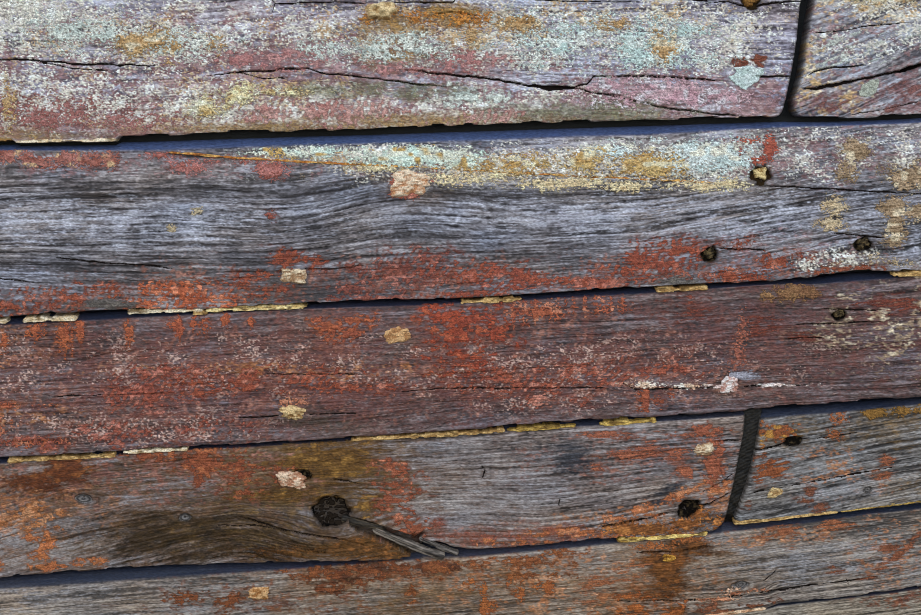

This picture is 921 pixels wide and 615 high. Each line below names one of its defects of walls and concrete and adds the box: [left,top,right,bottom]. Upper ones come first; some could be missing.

crack [0,58,156,71]
crack [210,68,741,117]
crack [759,63,921,90]
peeling [851,293,921,320]
peeling [0,232,887,501]
peeling [0,499,109,572]
peeling [274,420,732,615]
peeling [859,531,921,580]
peeling [161,587,247,615]